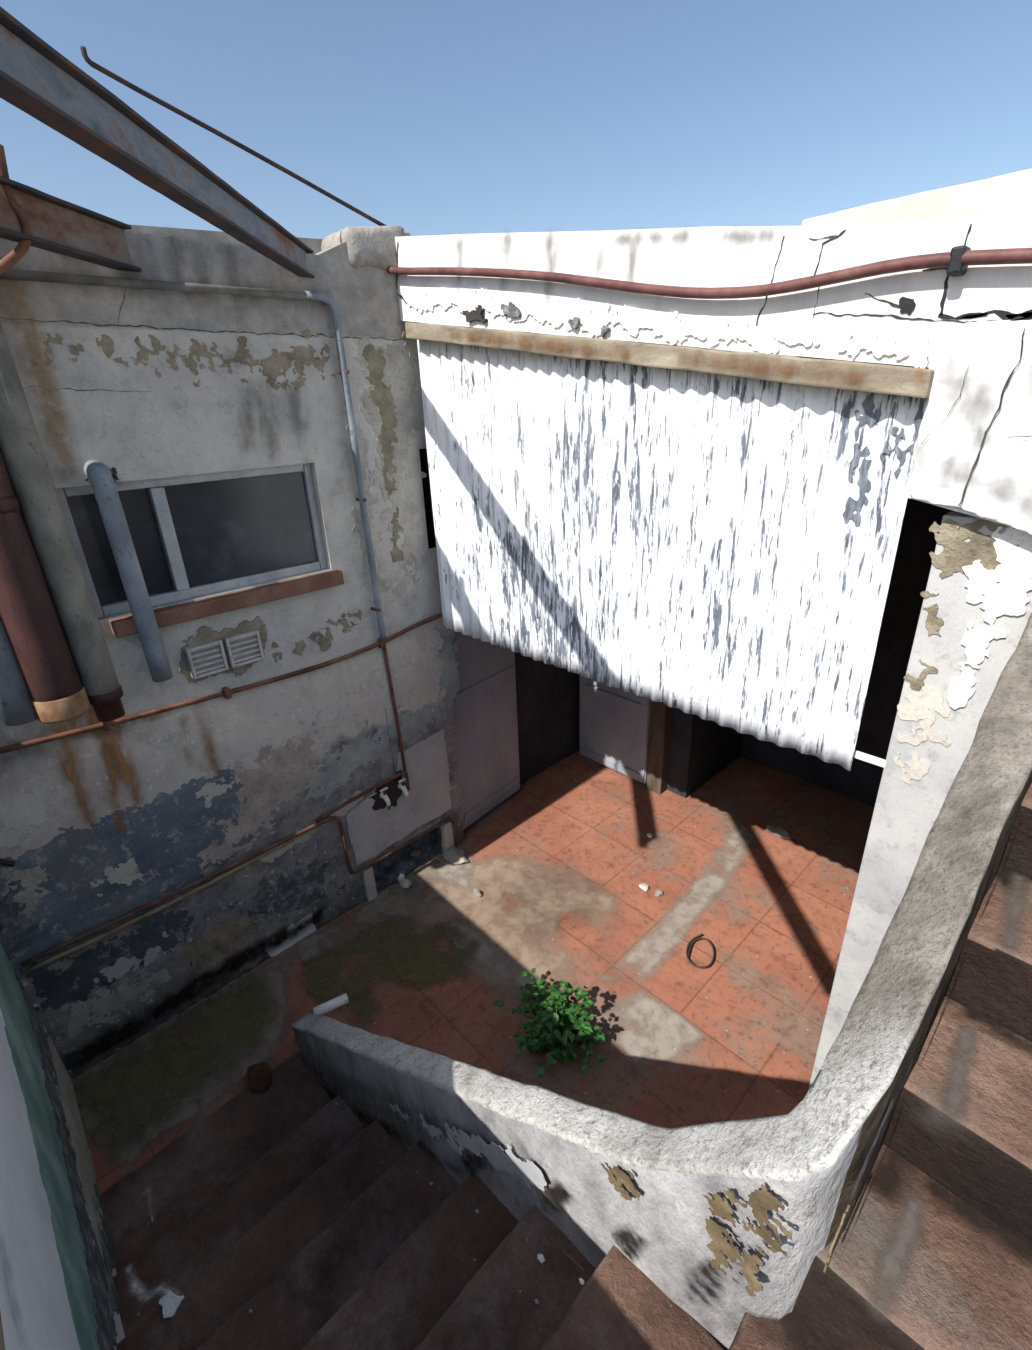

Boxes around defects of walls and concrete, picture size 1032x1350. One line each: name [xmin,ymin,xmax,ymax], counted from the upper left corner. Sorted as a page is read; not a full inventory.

peeling [30,328,338,390]
crack [756,224,1032,506]
flaking render [272,287,821,663]
peeling [842,394,924,526]
peeling [894,518,1032,785]
rust [53,705,154,822]
spalling [0,866,51,961]
peeling [90,858,144,897]
peeling [600,1163,641,1201]
peeling [823,1058,914,1273]
spalling [612,1229,642,1262]
peeling [689,1184,792,1305]